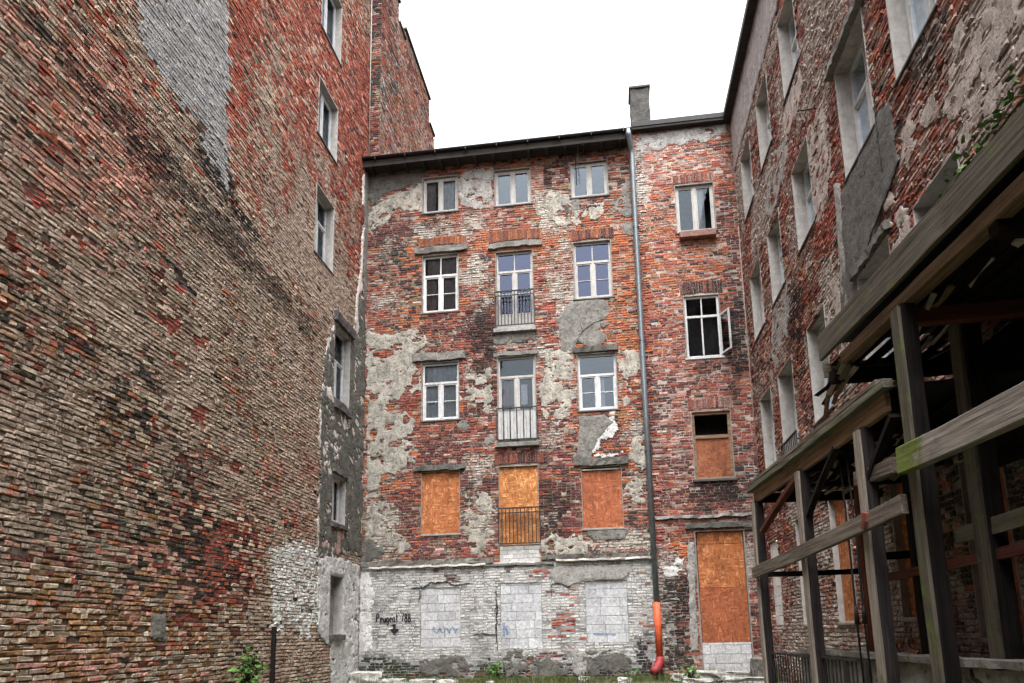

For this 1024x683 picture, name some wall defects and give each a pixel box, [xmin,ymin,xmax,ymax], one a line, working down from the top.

flaking render [898,0,1024,169]
leakage [231,197,259,242]
flaking render [458,167,500,211]
flaking render [535,179,633,236]
flaking render [268,169,427,683]
flaking render [457,359,495,459]
flaking render [592,349,654,503]
flaking render [461,490,496,556]
crack [413,579,470,602]